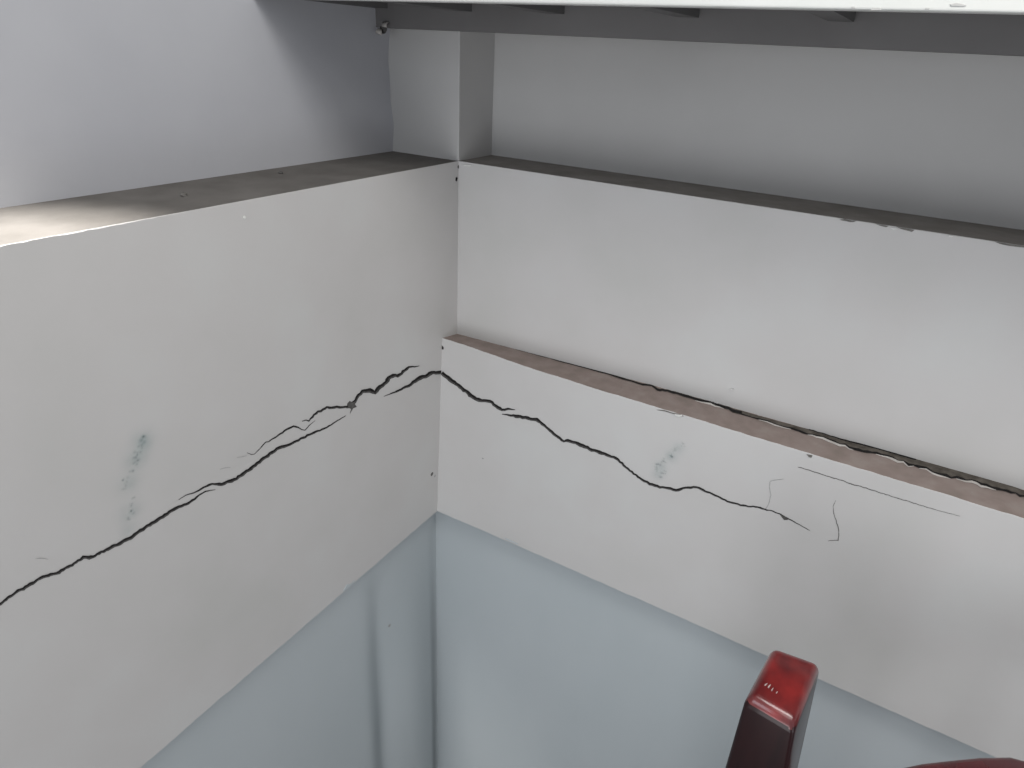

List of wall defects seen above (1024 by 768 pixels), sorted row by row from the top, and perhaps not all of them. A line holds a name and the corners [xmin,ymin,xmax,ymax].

crack [0,366,958,606]
crack [505,346,1024,497]